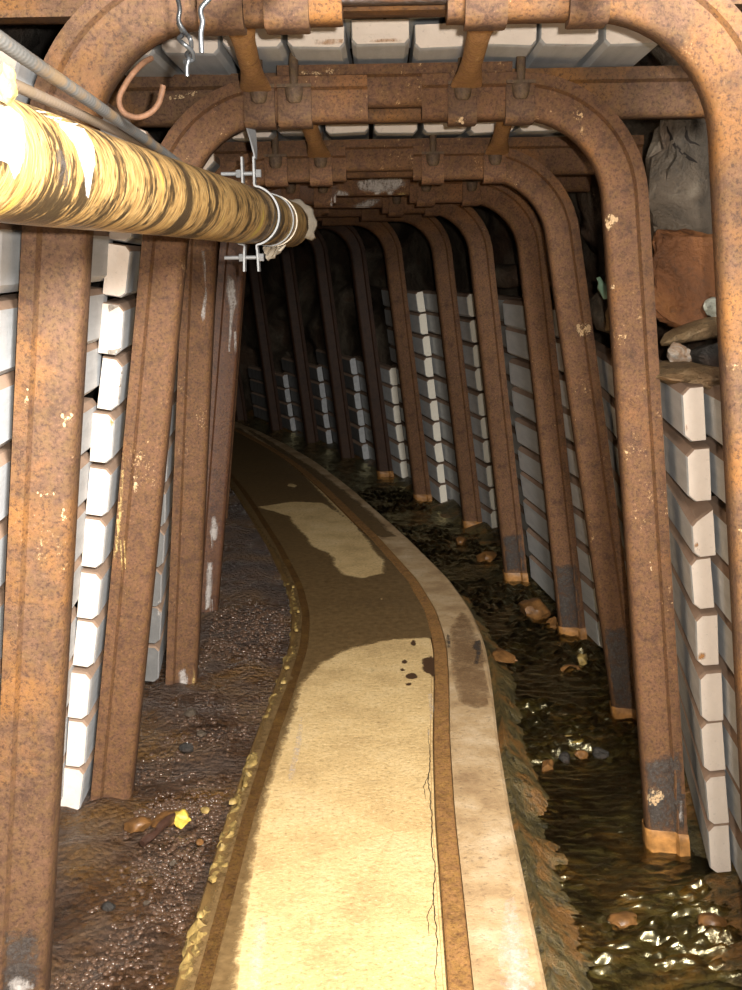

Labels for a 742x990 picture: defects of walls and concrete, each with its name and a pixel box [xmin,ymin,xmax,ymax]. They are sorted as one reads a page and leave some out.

water stain [184,428,435,990]
crack [423,732,438,979]
water stain [452,614,489,708]
corrosion [647,790,664,806]